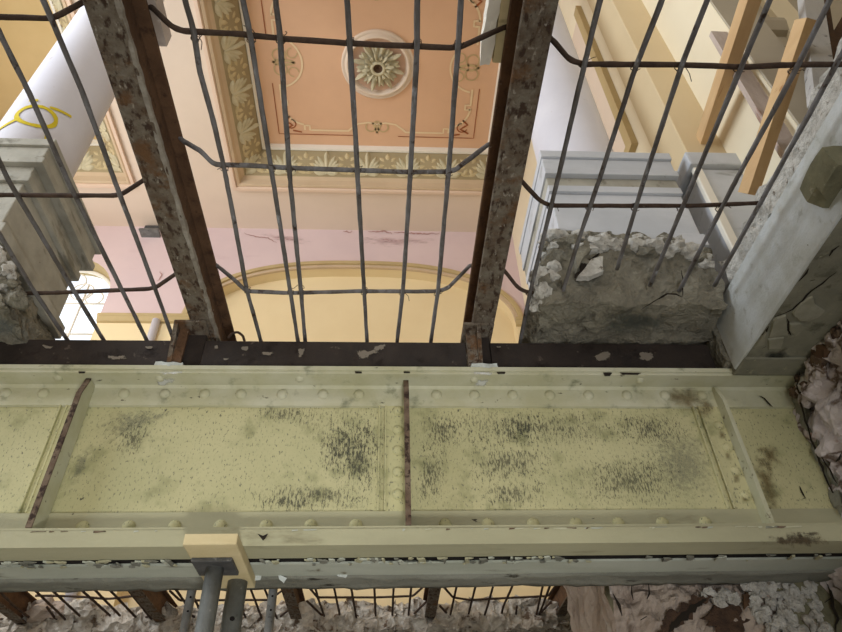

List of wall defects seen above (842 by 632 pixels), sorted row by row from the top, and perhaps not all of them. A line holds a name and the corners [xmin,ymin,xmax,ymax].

spalling [528,38,842,312]
spalling [0,245,30,311]
crack [762,246,839,335]
corrosion [25,378,91,528]
mould [252,408,382,511]
mould [418,408,686,508]